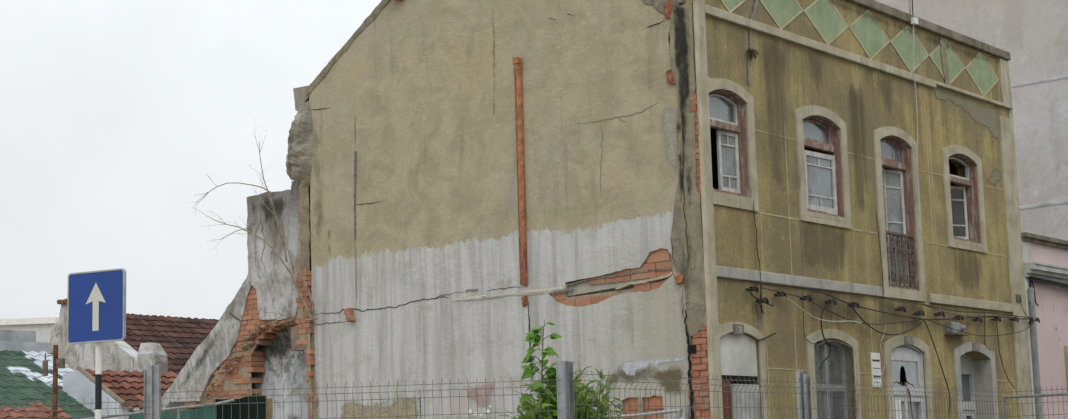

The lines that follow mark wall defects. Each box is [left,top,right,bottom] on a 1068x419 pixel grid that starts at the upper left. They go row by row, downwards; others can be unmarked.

spalling [443,248,673,306]